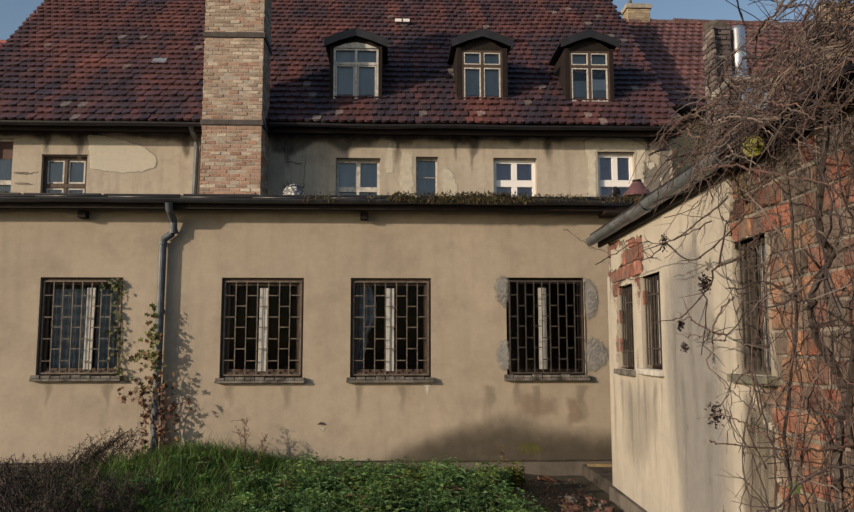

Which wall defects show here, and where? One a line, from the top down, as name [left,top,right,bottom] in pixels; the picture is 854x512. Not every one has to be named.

damp [386,136,414,195]
damp [442,169,457,196]
flaking render [608,236,648,351]
damp [671,262,724,512]
damp [396,427,612,462]